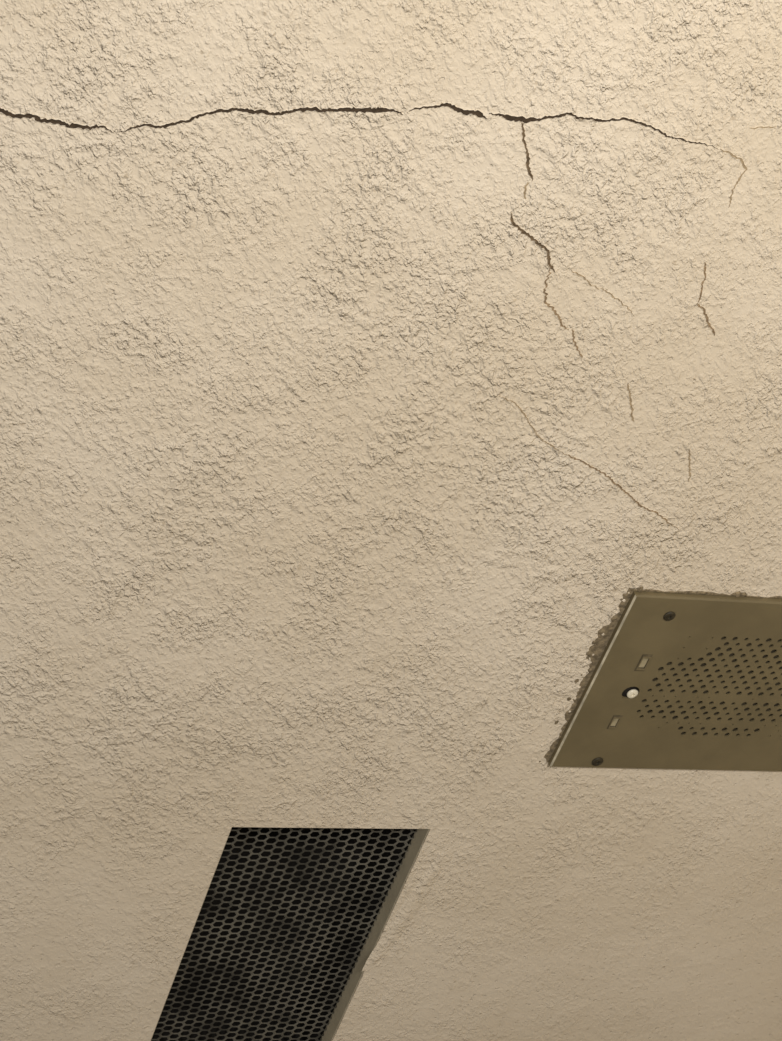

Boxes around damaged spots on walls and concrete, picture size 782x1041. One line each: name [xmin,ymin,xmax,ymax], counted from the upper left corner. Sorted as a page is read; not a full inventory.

crack [0,102,748,358]
crack [750,123,777,131]